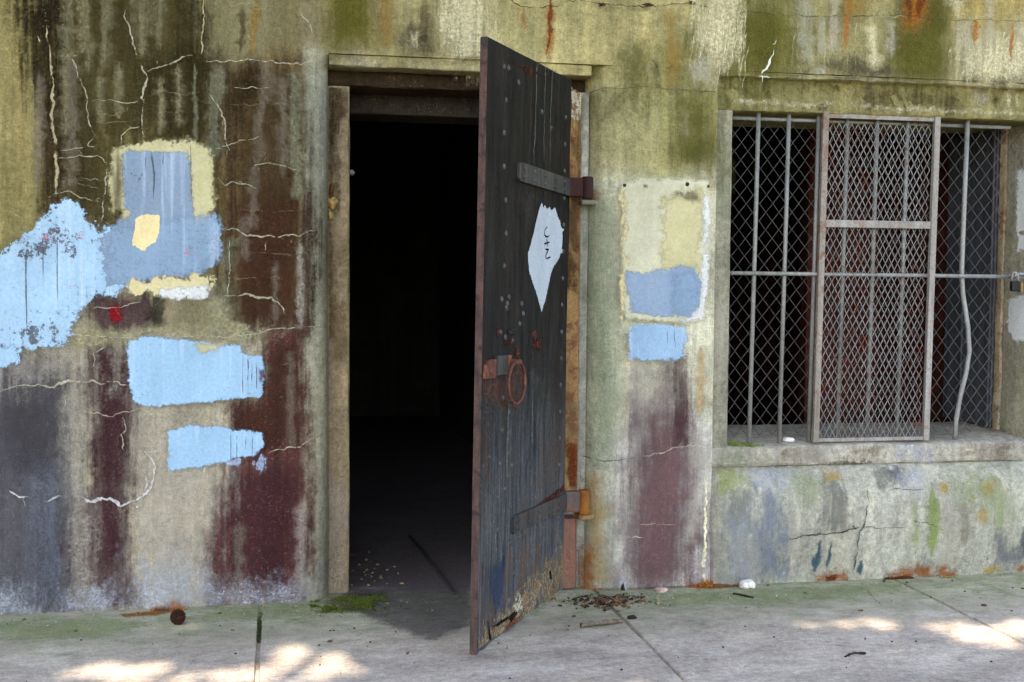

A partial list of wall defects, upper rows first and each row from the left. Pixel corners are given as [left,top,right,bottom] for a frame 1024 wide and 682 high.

water stain [381,0,483,63]
rust [513,0,557,147]
rust [571,91,581,123]
peeling [15,216,100,261]
crack [0,13,326,449]
peeling [0,317,60,349]
water stain [0,0,316,615]
crack [269,435,322,453]
crack [10,454,159,508]
rust [539,431,606,591]
crack [790,490,945,572]
rust [884,565,956,580]